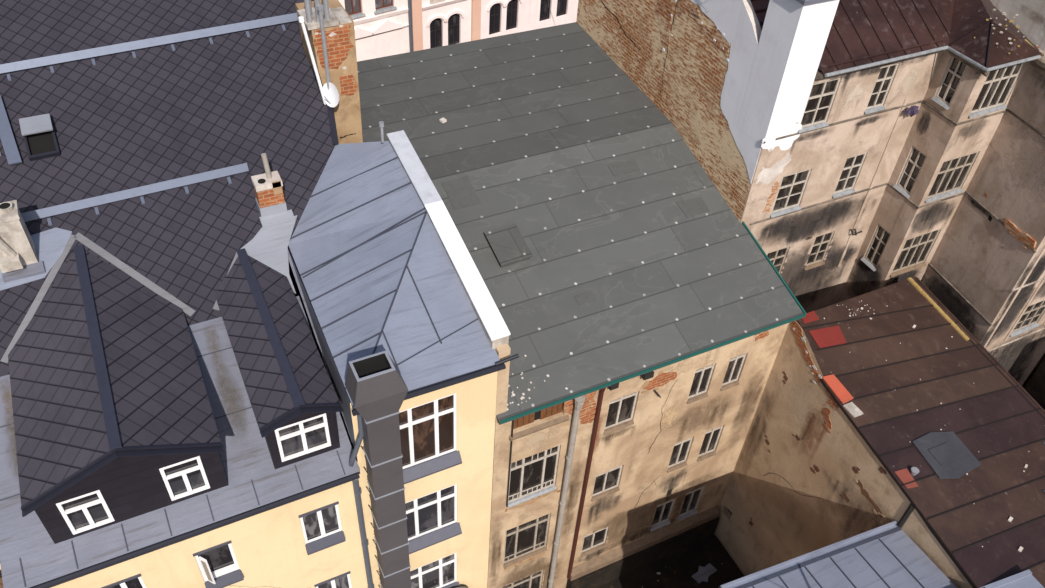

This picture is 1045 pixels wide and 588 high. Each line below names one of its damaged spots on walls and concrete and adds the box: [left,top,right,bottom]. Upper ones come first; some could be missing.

spalling [656,0,730,62]
peeling [756,122,802,213]
flaking render [988,215,1037,250]
flaking render [563,391,597,424]
spalling [641,371,677,394]
flaking render [792,321,840,433]
damp [607,483,699,544]
spalling [852,466,885,524]